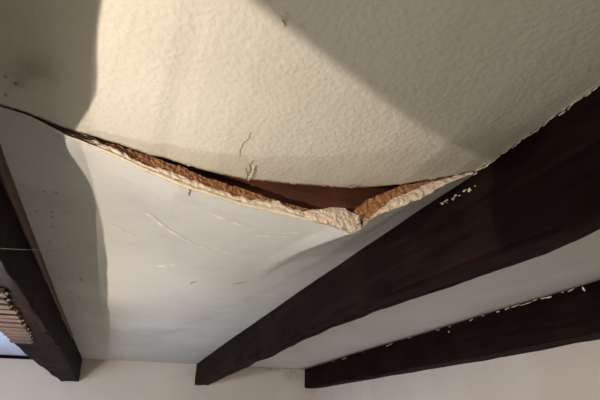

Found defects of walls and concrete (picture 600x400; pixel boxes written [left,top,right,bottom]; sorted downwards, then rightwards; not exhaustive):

crack [240,133,256,180]
spalling [12,85,600,235]